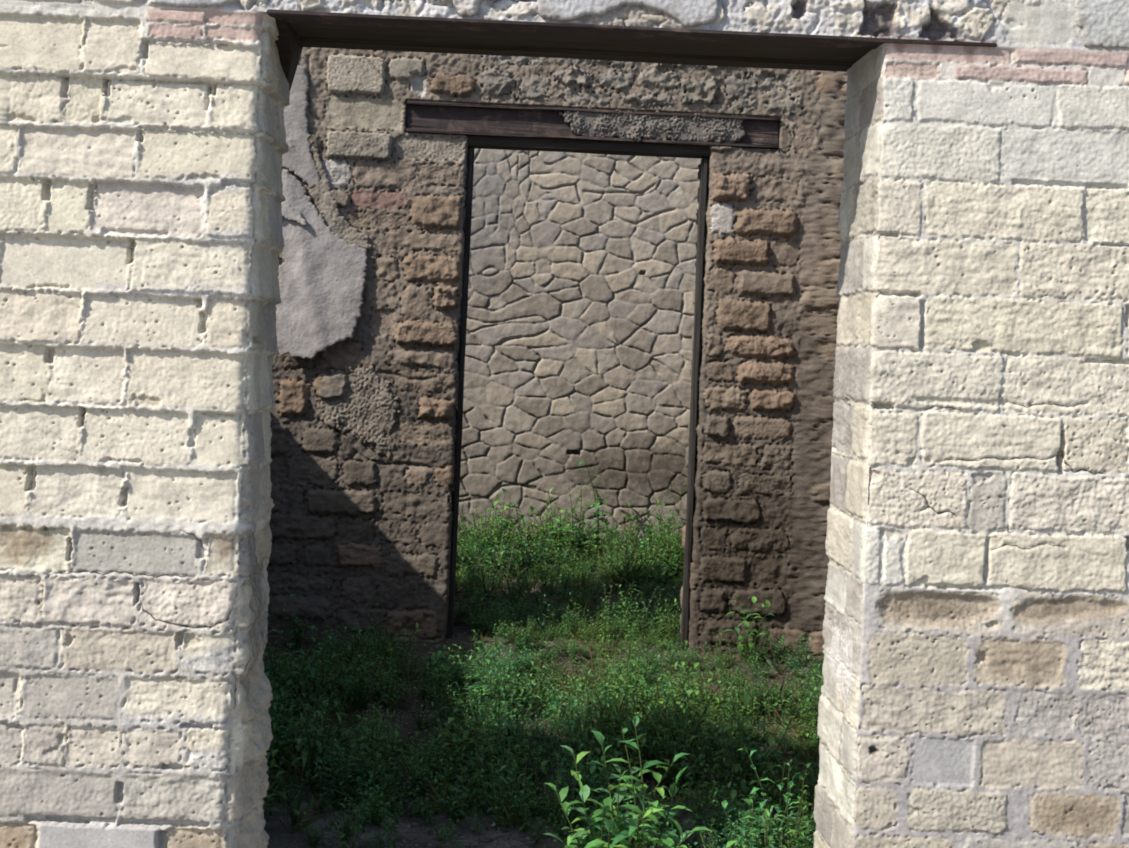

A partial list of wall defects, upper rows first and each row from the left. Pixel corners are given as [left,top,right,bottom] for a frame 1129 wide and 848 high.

flaking render [276,65,372,359]
crack [907,487,957,517]
crack [52,570,234,628]